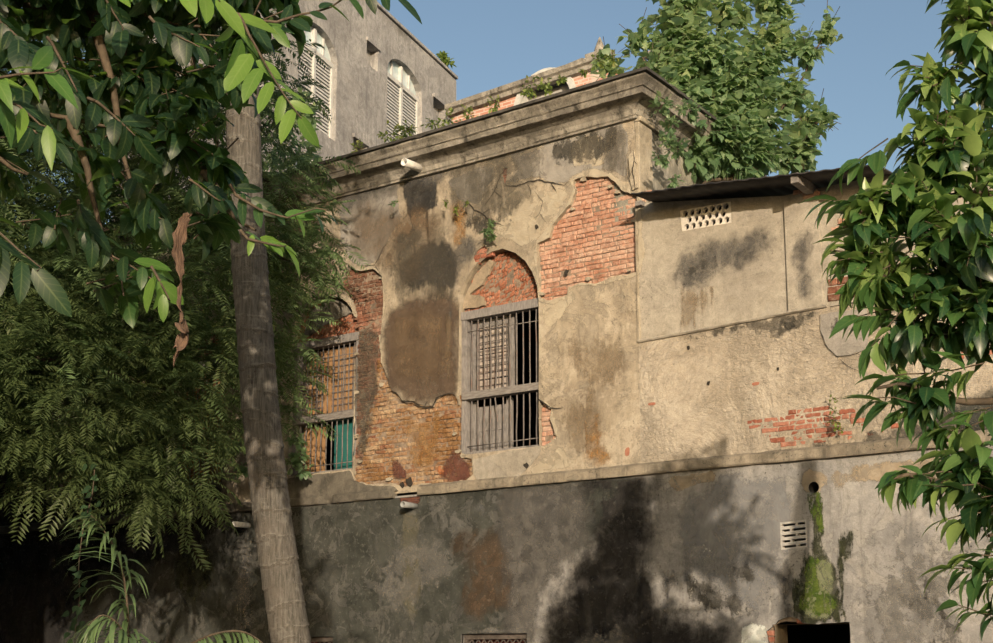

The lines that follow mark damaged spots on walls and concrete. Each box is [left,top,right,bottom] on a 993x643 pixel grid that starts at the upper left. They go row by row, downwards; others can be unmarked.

water stain [0,365,271,643]
flaking render [340,184,473,487]
water stain [291,452,728,643]
flaking render [497,134,652,327]
water stain [675,230,768,324]
flaking render [767,617,807,643]
flaking render [747,406,871,447]